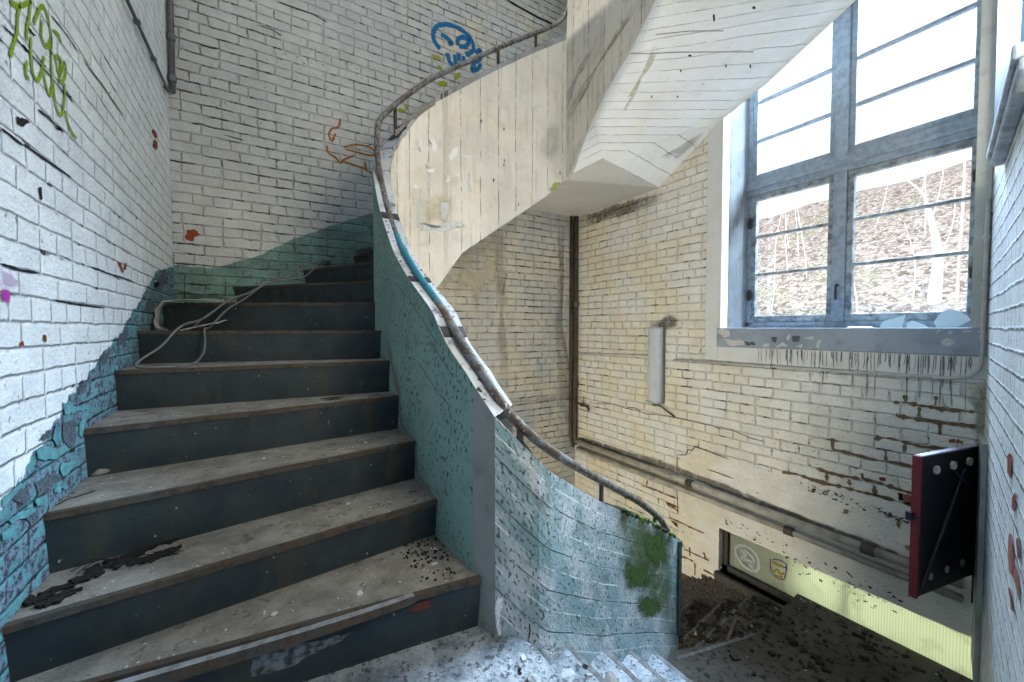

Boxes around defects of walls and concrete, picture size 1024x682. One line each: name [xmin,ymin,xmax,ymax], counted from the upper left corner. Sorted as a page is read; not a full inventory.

peeling [411,138,472,231]
peeling [145,272,168,313]
peeling [100,328,129,366]
peeling [718,329,821,348]
leakage [758,349,986,435]
peeling [1,378,90,541]
spalling [782,464,911,524]
spalling [830,395,977,468]
spalling [1008,534,1020,612]
spalling [251,633,355,677]